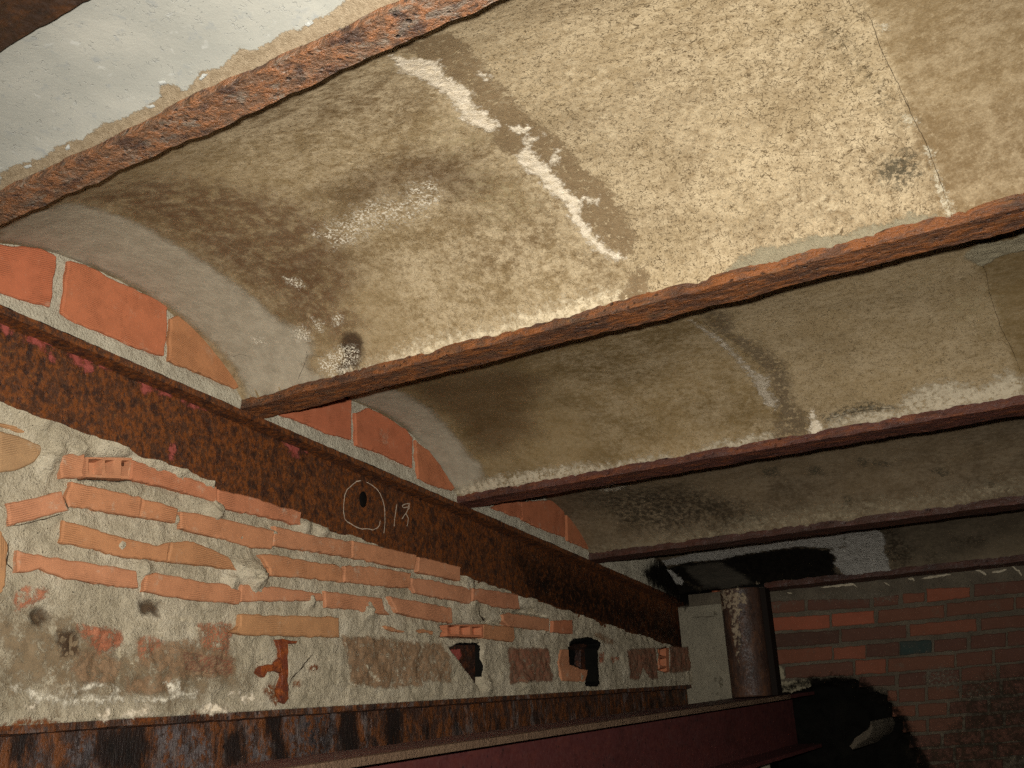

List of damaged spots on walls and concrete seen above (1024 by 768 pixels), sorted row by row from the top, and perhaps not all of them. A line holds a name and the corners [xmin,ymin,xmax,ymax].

peeling [0,0,399,190]
crack [861,2,952,214]
damp [388,48,627,262]
damp [294,284,645,377]
damp [808,368,1024,434]
damp [455,432,774,496]
spalling [30,609,46,625]
spalling [57,631,78,657]
spalling [139,602,157,616]
corrosion [3,719,57,761]
corrosion [264,684,285,760]
corrosion [340,712,358,751]